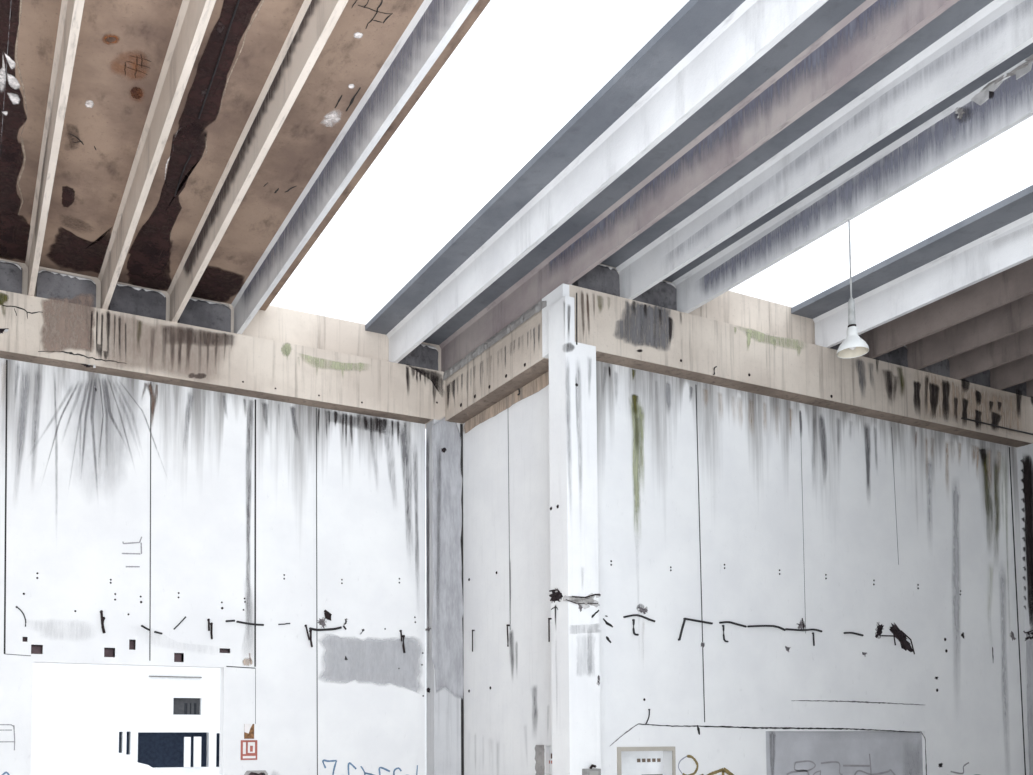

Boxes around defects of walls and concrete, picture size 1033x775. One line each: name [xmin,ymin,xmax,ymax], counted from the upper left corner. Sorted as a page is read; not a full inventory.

corrosion [103,35,119,44]
crack [352,0,393,28]
corrosion [130,87,143,99]
crack [124,55,151,78]
spalling [955,55,1033,120]
water stain [549,0,897,268]
water stain [704,63,1033,289]
water stain [615,301,672,352]
water stain [151,327,229,379]
water stain [406,366,458,404]
water stain [465,371,549,433]
water stain [914,378,1033,429]